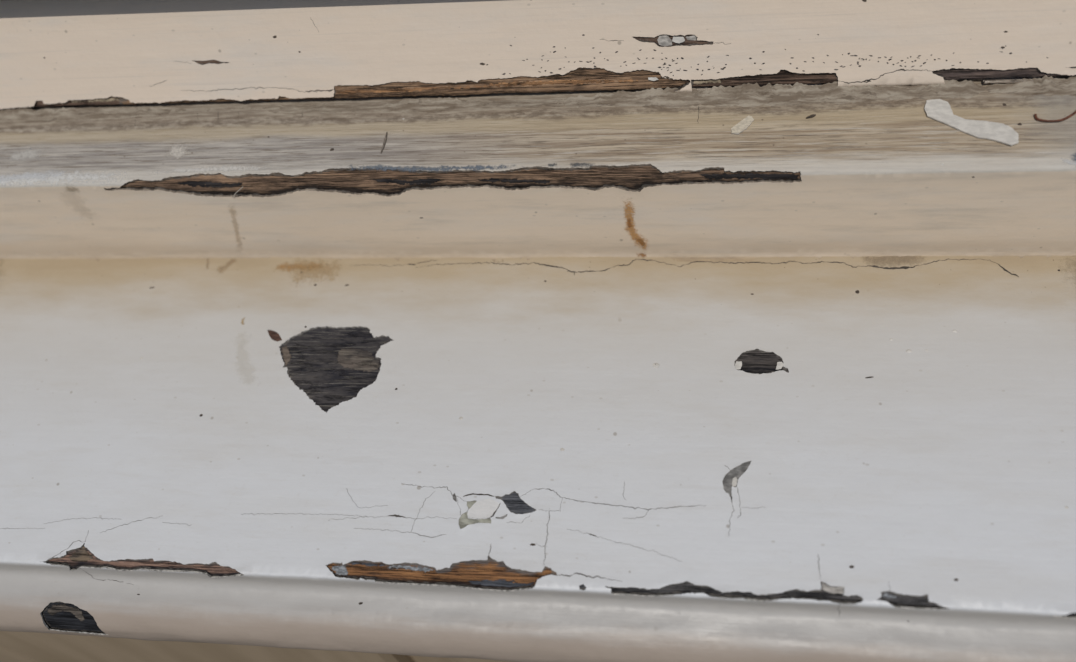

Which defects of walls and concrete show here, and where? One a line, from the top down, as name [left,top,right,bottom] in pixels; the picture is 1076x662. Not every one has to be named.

peeling [32,34,1076,107]
peeling [108,165,801,196]
corrosion [625,204,646,257]
crack [350,259,1019,277]
peeling [268,327,393,413]
peeling [734,349,789,374]
crack [242,488,456,538]
peeling [722,461,766,537]
peeling [42,602,104,633]
peeling [46,539,241,585]
peeling [327,545,863,617]
peeling [877,583,947,608]